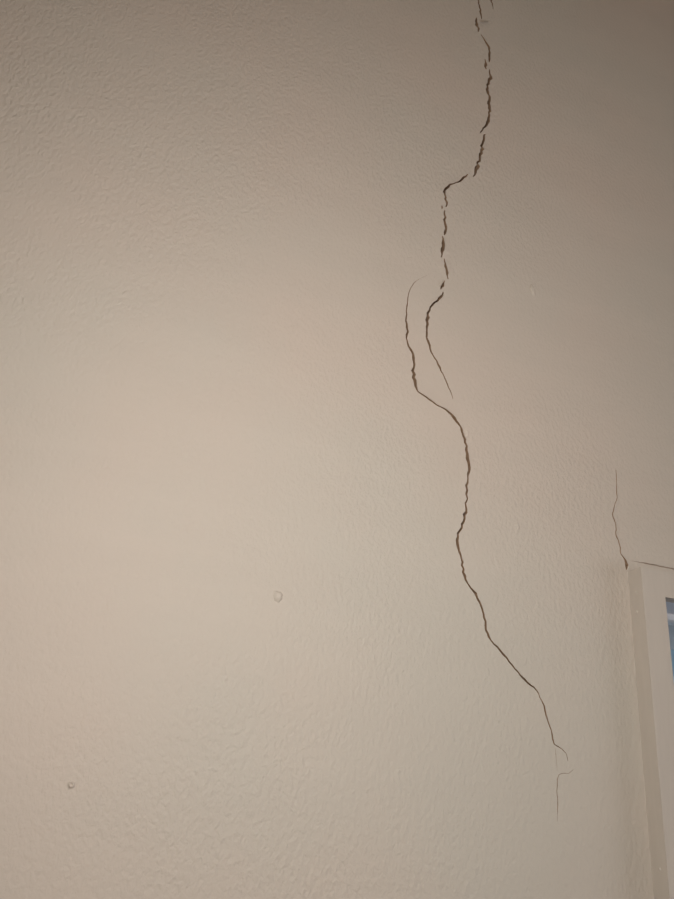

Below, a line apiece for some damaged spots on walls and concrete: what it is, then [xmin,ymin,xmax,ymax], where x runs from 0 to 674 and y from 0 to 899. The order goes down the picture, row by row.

crack [405,0,568,818]